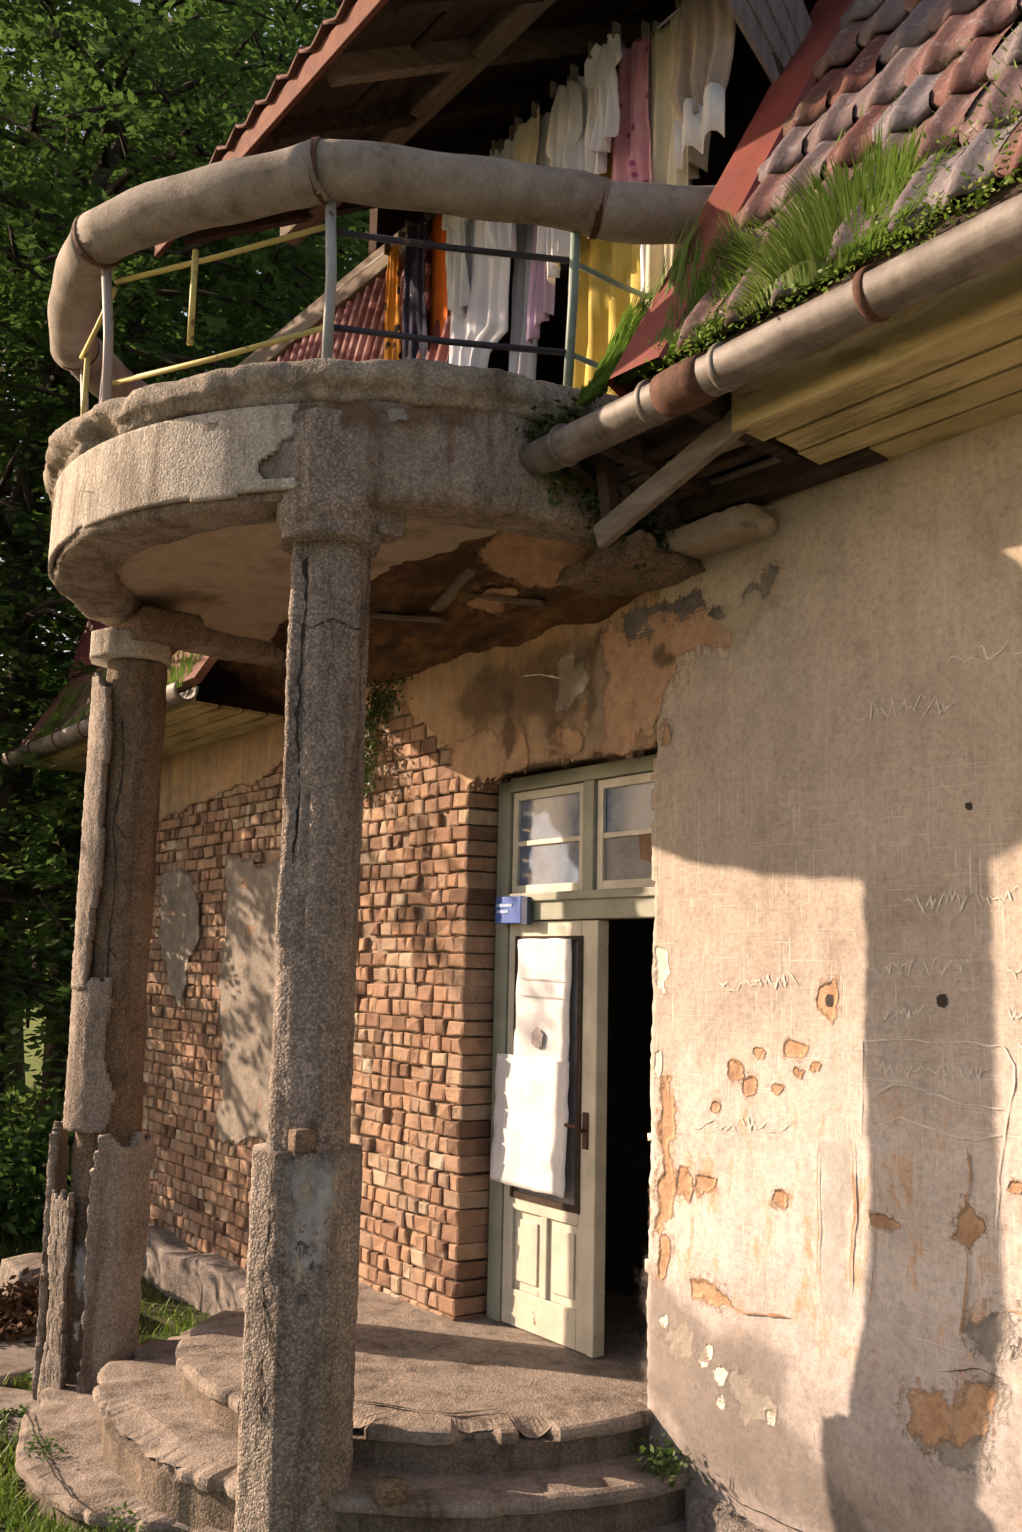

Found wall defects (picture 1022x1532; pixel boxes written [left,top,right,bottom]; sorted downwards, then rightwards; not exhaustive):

spalling [386,404,410,425]
crack [291,552,362,864]
peeling [447,579,735,792]
peeling [652,945,671,998]
peeling [813,974,839,1024]
peeling [649,1049,717,1283]
peeling [868,1210,900,1234]
spalling [74,1250,86,1292]
peeling [685,1270,788,1317]
peeling [895,1148,1022,1484]
crack [708,1470,803,1532]